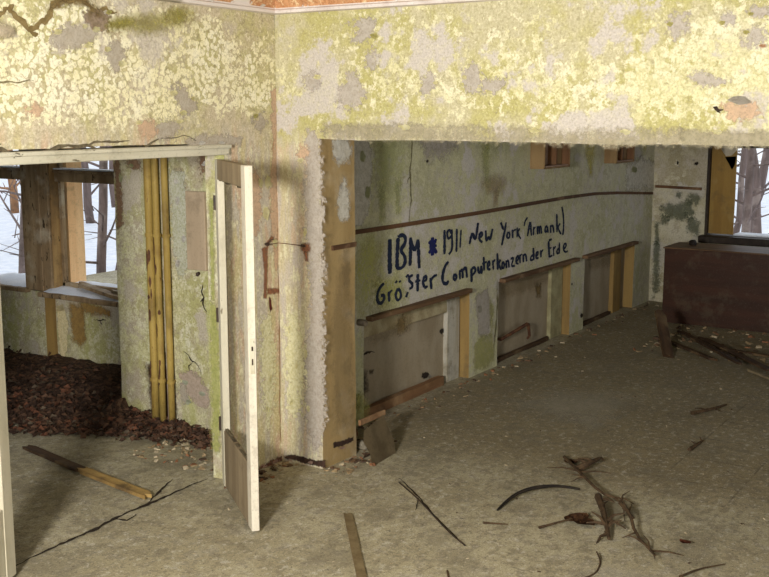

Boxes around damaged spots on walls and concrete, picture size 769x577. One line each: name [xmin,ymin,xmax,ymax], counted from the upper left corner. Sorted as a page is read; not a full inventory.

crack [0,0,117,37]
flaking render [46,8,129,74]
peeling [250,0,393,8]
flaking render [719,12,736,27]
flaking render [740,4,769,49]
peeling [24,101,43,117]
flaking render [136,81,243,148]
crack [406,142,414,221]
corrosion [262,236,279,312]
leakage [653,193,699,293]
crack [16,479,206,566]